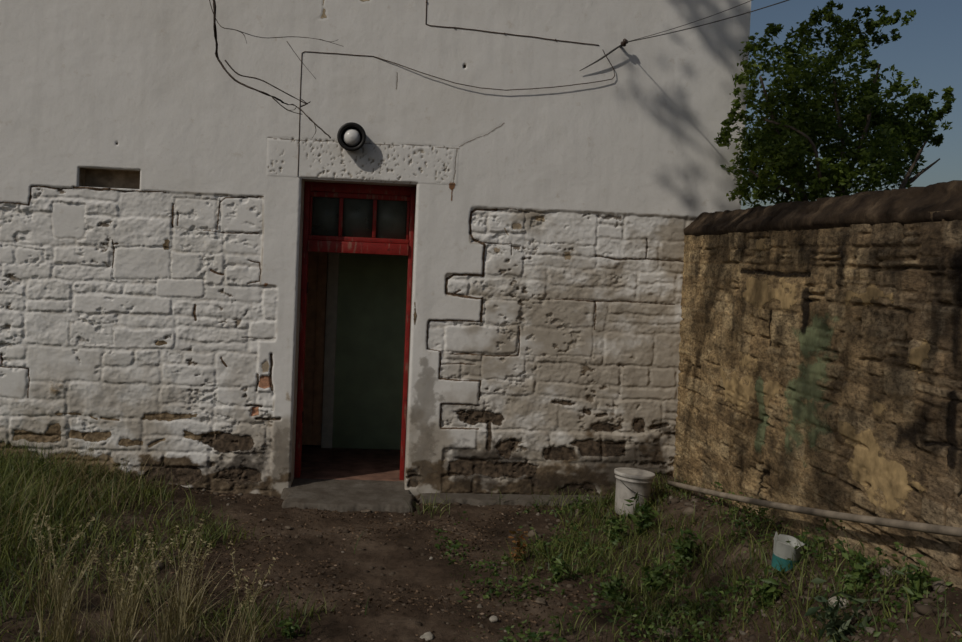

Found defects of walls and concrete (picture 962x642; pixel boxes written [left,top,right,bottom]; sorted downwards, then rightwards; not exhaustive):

spalling [256,353,273,391]
spalling [0,412,165,467]
spalling [142,412,254,453]
spalling [246,404,281,420]
spalling [448,400,669,479]
spalling [52,452,119,471]
leakage [455,427,669,494]